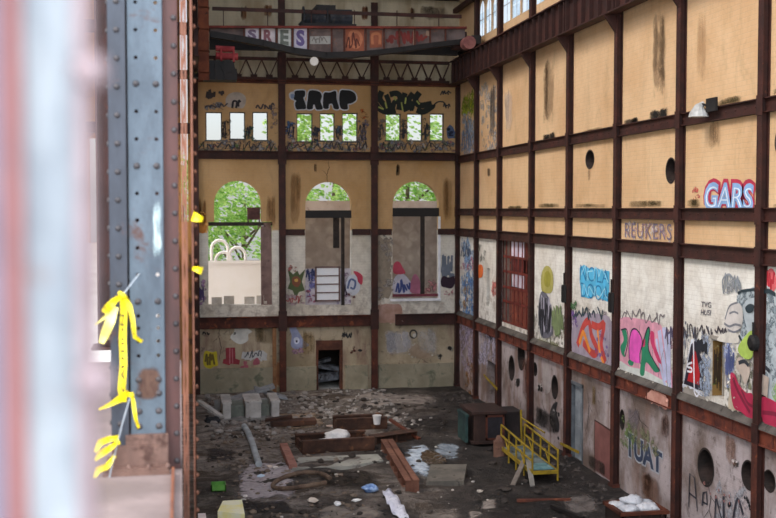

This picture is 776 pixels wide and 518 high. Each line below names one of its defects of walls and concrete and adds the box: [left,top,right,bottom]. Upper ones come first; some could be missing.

peeling [645,382,668,410]